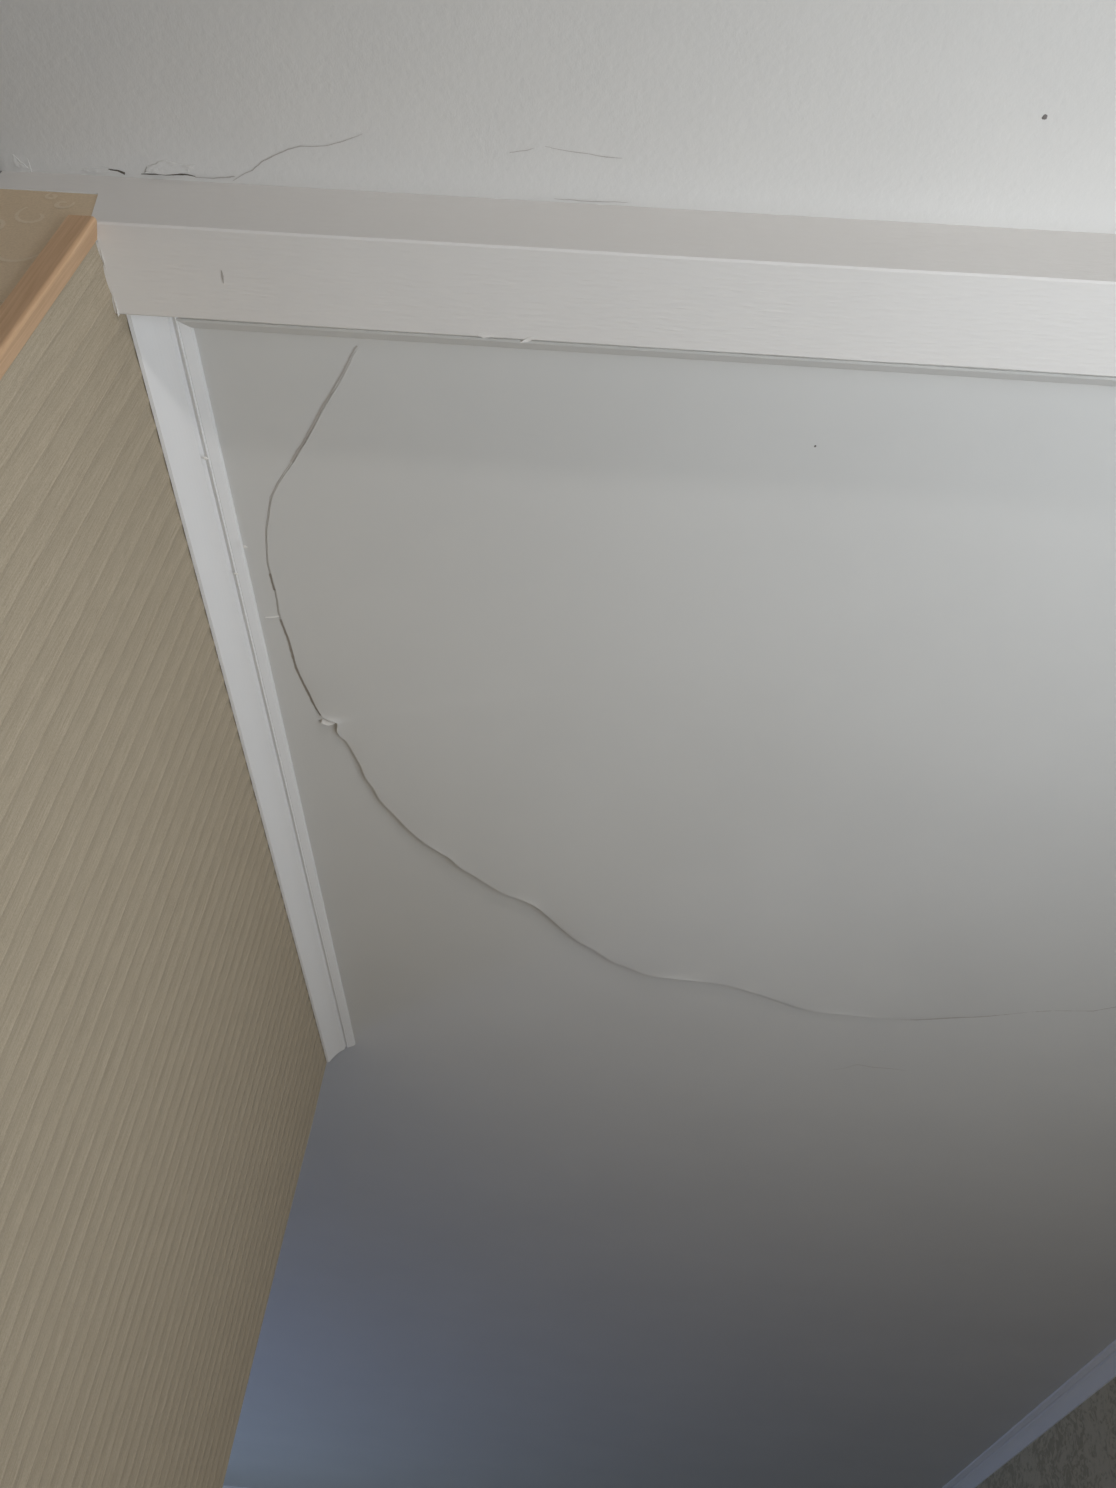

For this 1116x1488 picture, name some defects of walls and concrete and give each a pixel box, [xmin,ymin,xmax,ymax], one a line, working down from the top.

crack [109,134,362,181]
crack [265,346,1116,1020]